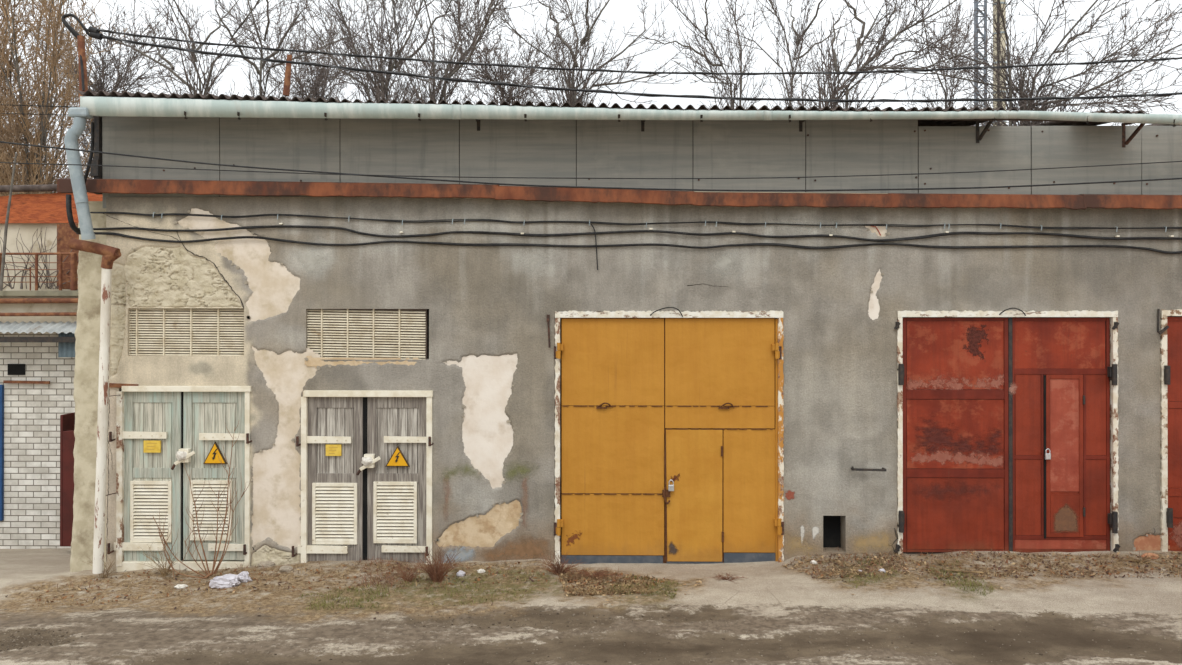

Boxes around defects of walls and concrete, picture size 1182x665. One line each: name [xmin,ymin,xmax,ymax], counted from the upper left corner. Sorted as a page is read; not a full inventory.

spalling [110,208,300,375]
flaking render [868,269,884,320]
rust [961,324,989,360]
flaking render [442,354,518,489]
rust [917,427,1001,456]
flaking render [436,500,523,548]
rust [1054,505,1078,532]